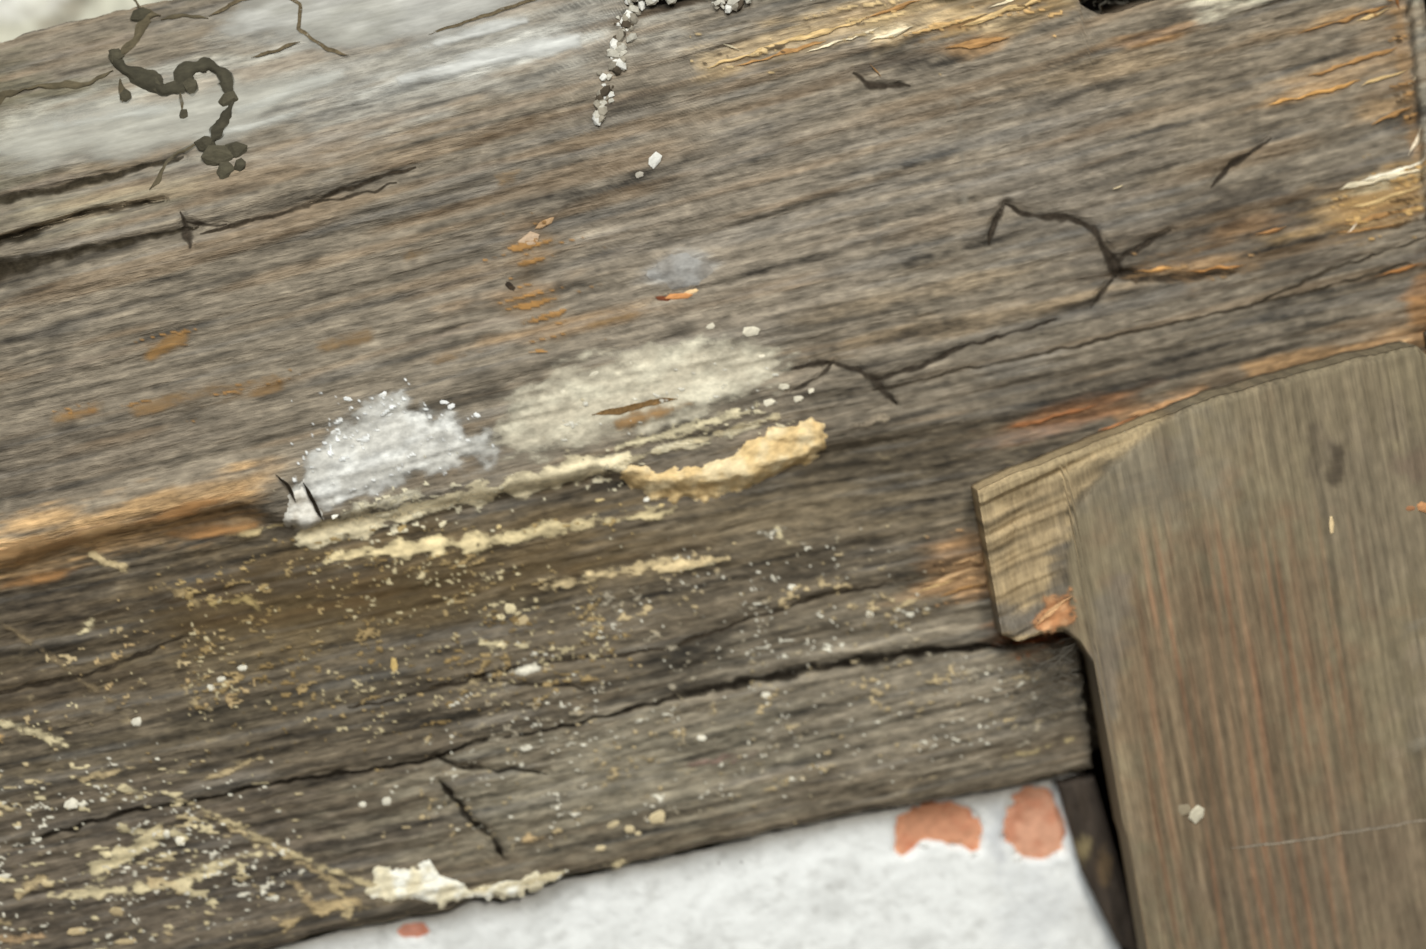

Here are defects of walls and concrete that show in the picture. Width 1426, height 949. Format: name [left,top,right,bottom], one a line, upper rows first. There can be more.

crack [1210,138,1272,188]
crack [779,203,1426,405]
leakage [850,413,898,427]
leakage [156,500,214,518]
leakage [191,363,828,620]
leakage [0,523,128,583]
leakage [162,581,269,628]
crack [0,582,1070,859]